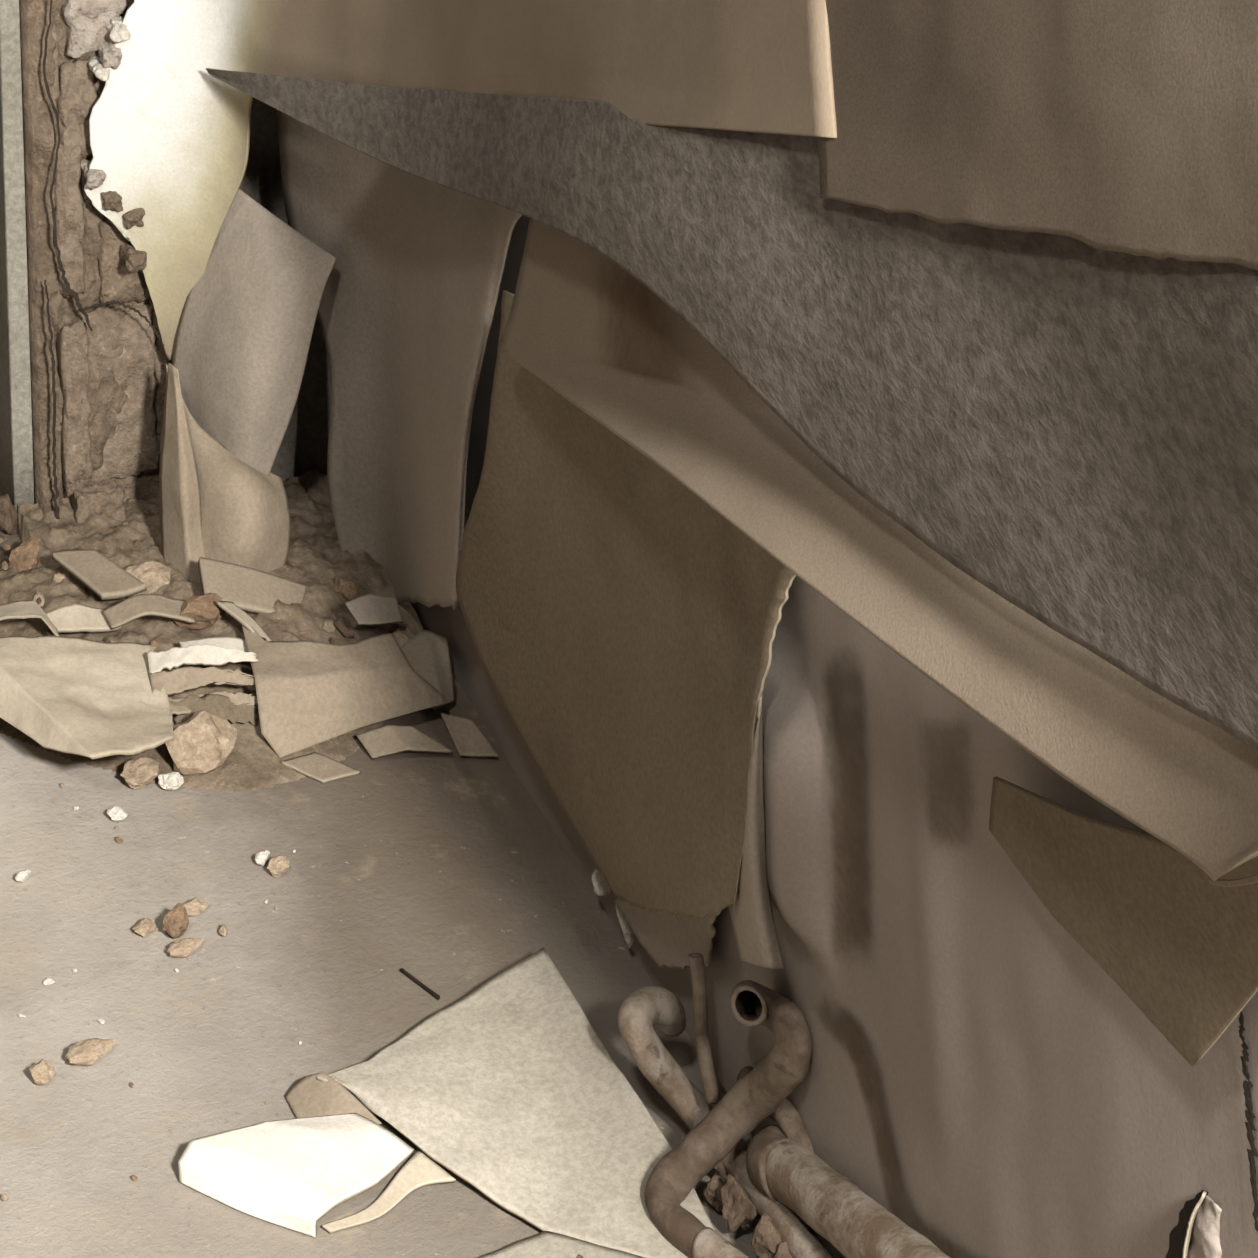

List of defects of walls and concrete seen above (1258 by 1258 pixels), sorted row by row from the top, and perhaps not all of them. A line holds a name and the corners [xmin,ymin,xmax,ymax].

spalling [19,0,173,524]
crack [1238,1011,1258,1232]